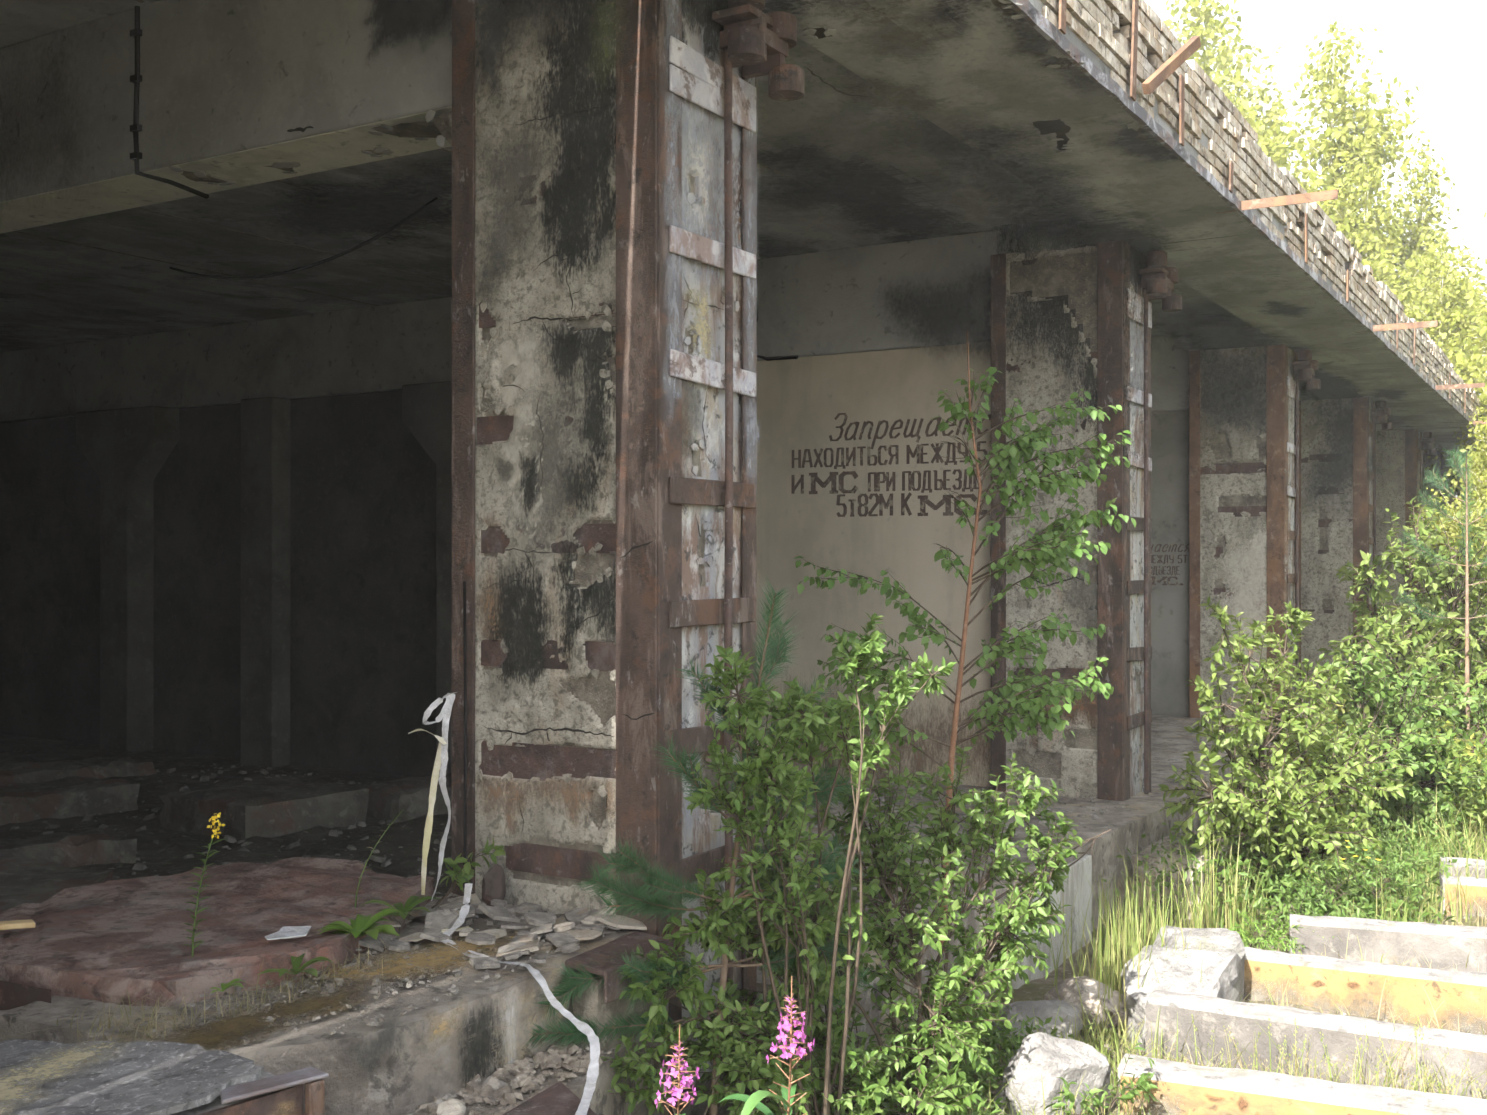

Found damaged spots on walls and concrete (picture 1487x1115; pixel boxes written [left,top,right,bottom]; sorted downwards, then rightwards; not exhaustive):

leakage [369,0,452,52]
leakage [475,0,616,303]
corrosion [733,159,742,249]
spalling [1010,246,1097,365]
peeling [475,302,545,543]
leakage [489,304,616,683]
spalling [572,542,616,587]
leakage [430,1004,514,1084]